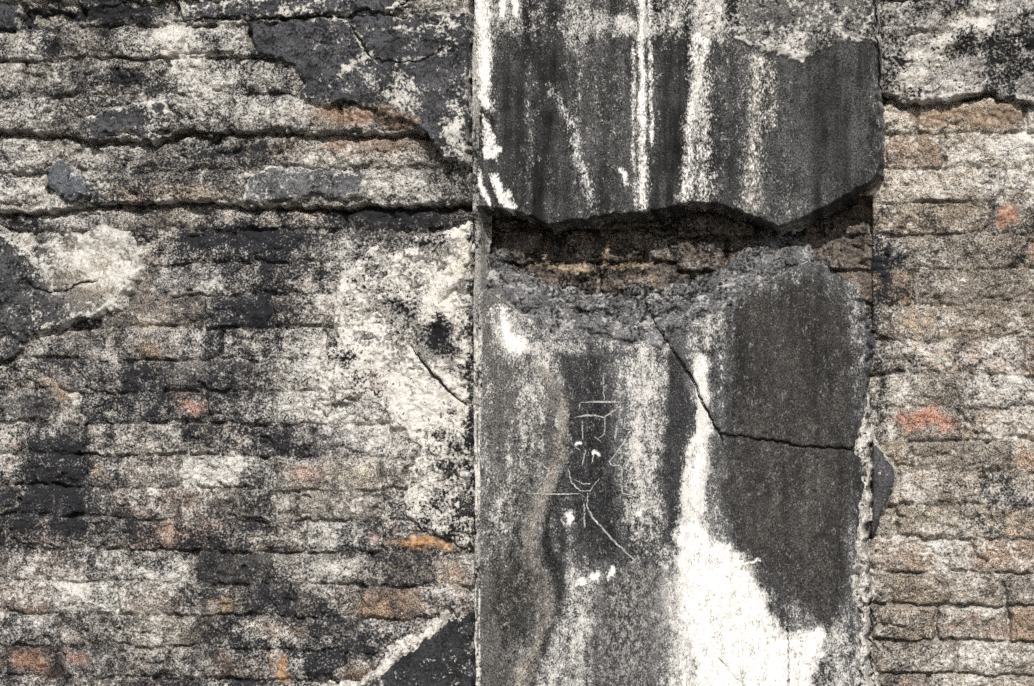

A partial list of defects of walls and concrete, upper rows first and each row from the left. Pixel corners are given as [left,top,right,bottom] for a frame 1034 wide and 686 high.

damp [474,0,520,216]
damp [545,84,593,205]
damp [619,0,654,211]
damp [678,30,716,205]
damp [739,55,779,214]
crack [412,346,468,405]
spalling [315,196,873,551]
crack [645,302,853,450]
damp [480,266,868,686]
peeling [320,609,476,686]